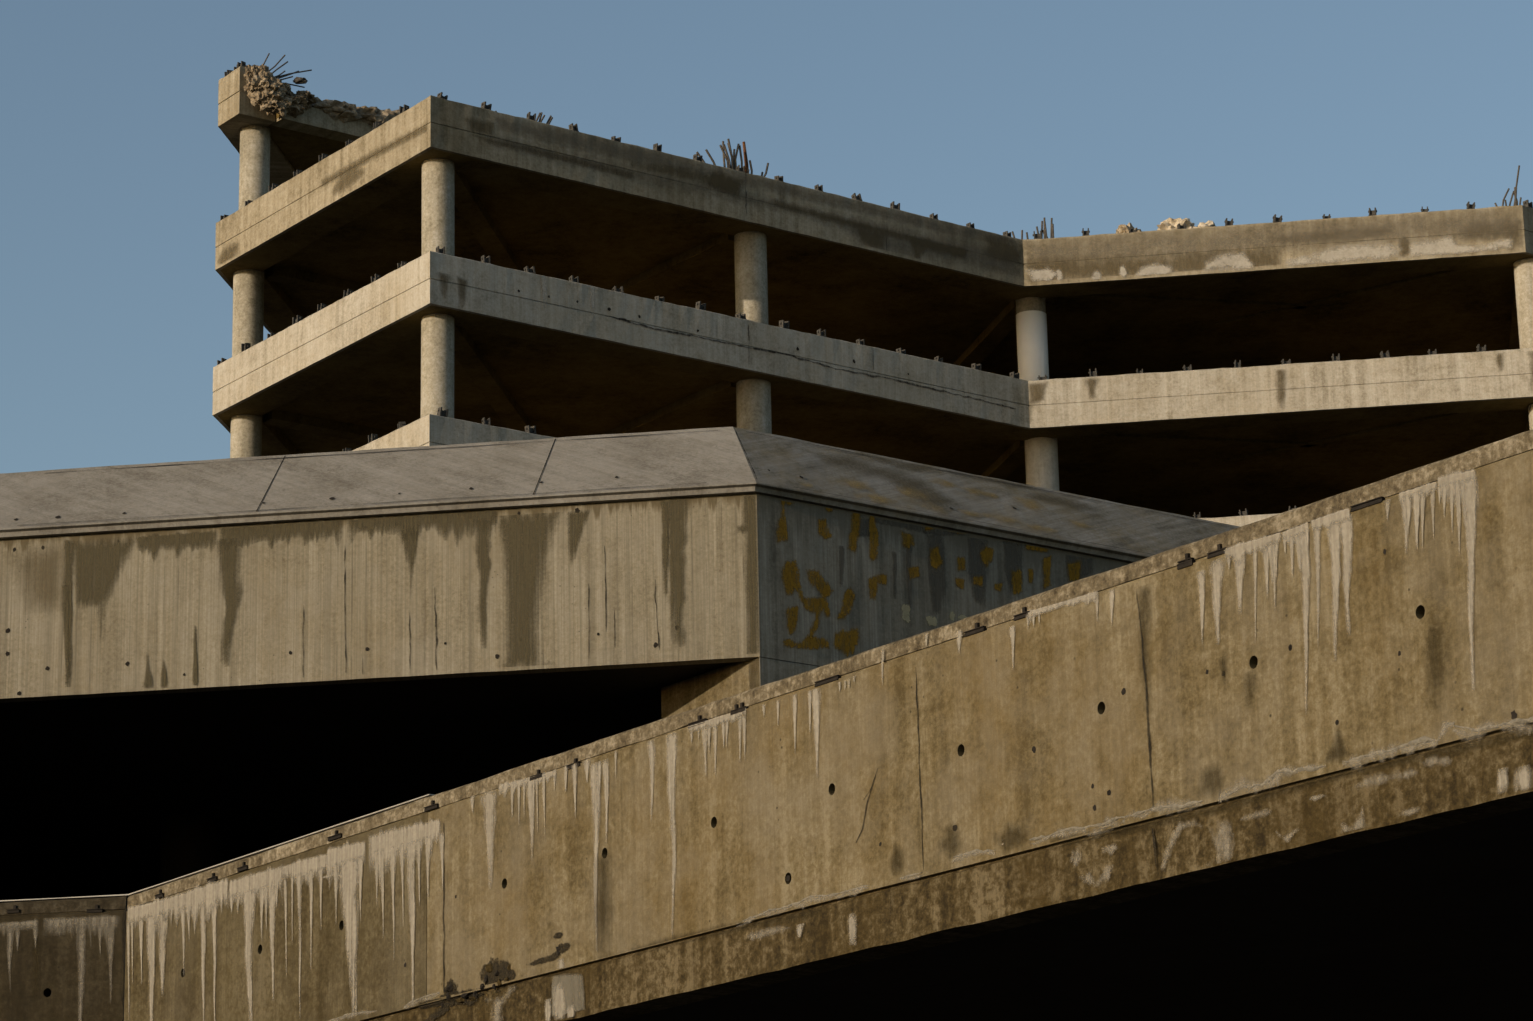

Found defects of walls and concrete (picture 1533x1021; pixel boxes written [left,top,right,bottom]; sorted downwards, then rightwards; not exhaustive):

spalling [218,53,399,186]
leakage [144,657,167,688]
leakage [26,511,589,683]
leakage [661,499,687,646]
leakage [738,496,759,654]
leakage [1198,508,1352,699]
leakage [1386,469,1476,685]
leakage [0,819,444,1021]
leakage [470,751,617,938]
leakage [648,689,819,940]